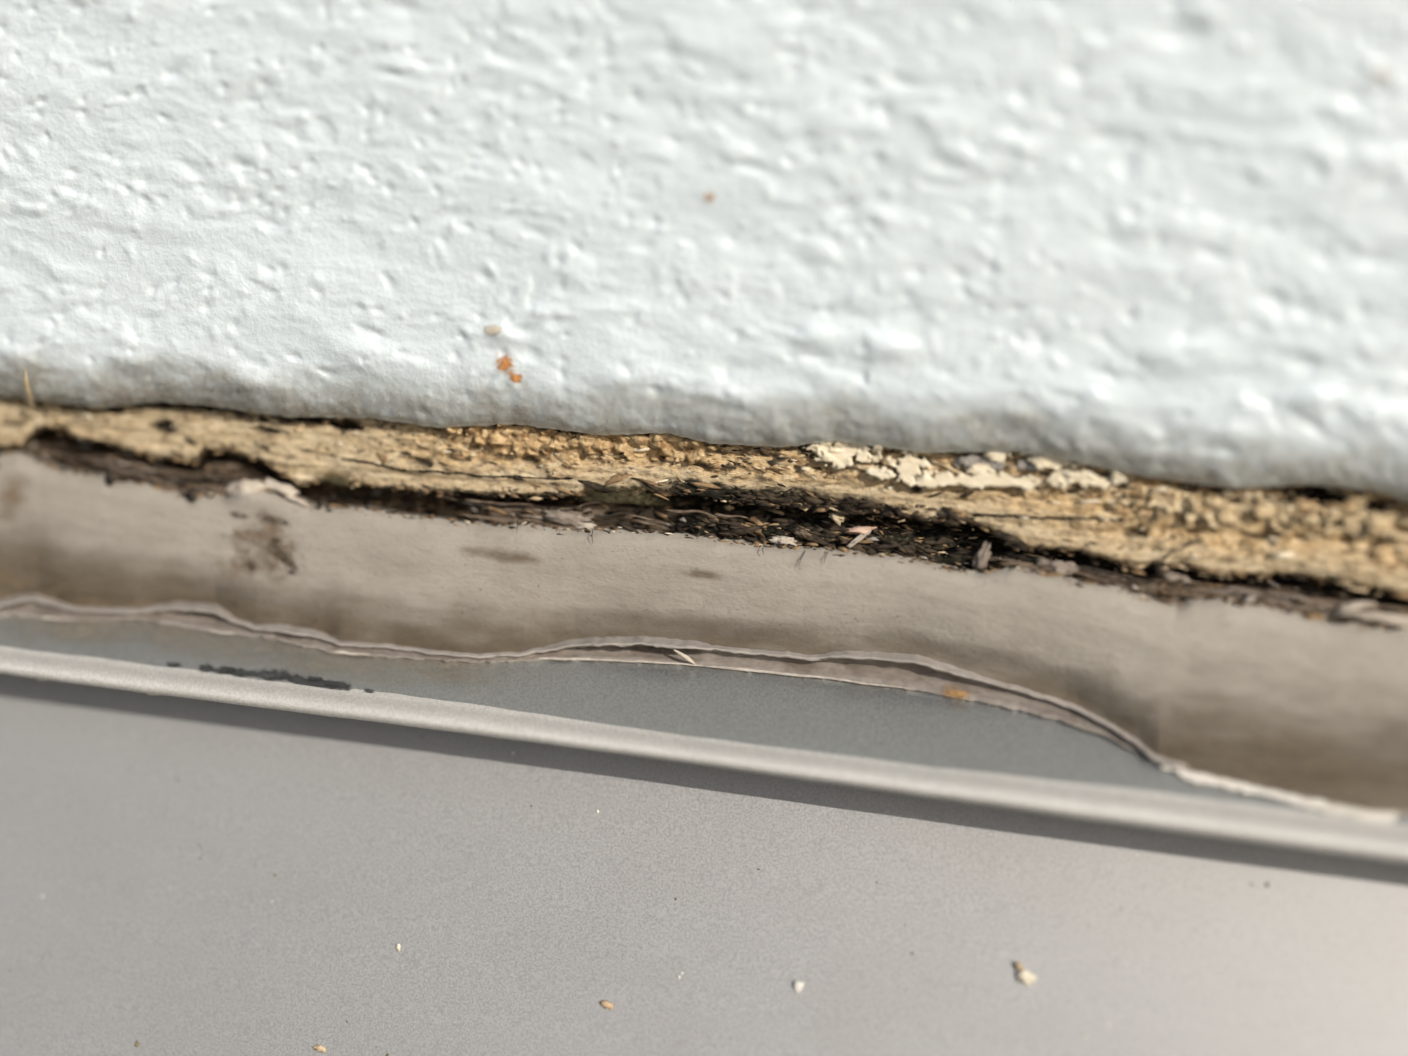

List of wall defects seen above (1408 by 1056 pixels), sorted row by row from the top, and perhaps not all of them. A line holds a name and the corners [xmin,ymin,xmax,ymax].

spalling [444,424,723,465]
spalling [803,440,1408,543]
water stain [232,513,296,574]